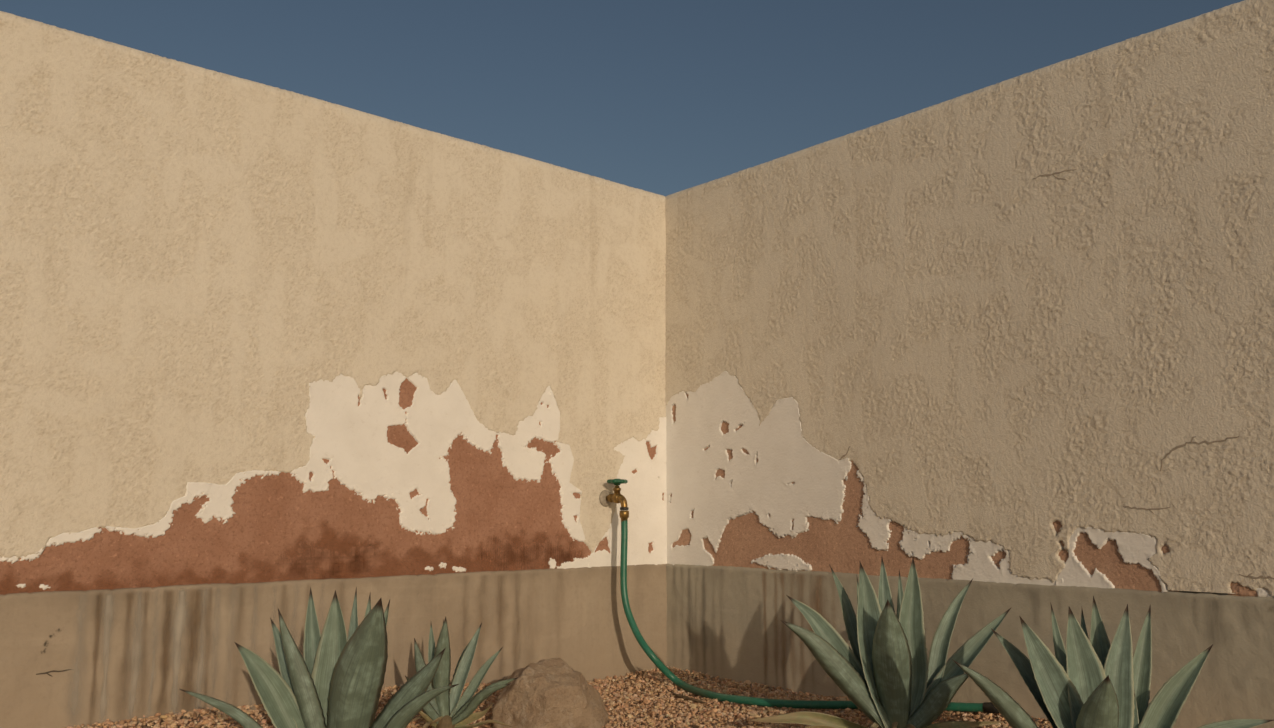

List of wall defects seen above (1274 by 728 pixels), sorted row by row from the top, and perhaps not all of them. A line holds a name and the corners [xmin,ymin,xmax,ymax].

crack [1160,436,1239,471]
peeling [0,371,1179,595]
crack [1123,506,1170,514]